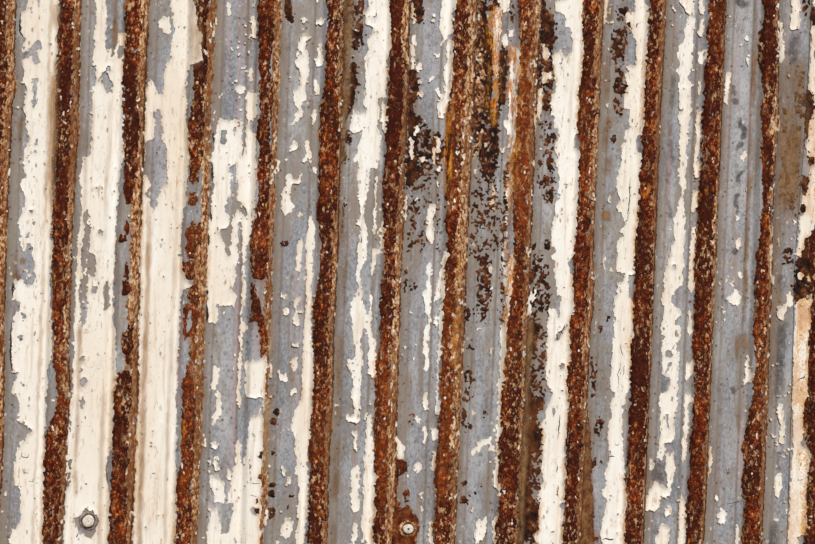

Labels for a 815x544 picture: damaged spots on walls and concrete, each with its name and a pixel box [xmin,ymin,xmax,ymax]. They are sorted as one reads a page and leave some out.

peeling [0,0,72,544]
corrosion [42,0,82,544]
corrosion [107,0,151,544]
peeling [57,0,326,544]
peeling [338,0,399,544]
corrosion [372,0,560,544]
peeling [403,0,607,544]
corrosion [562,0,632,544]
peeling [599,0,649,544]
corrosion [623,0,667,544]
peeling [645,0,708,544]
corrosion [741,0,815,544]